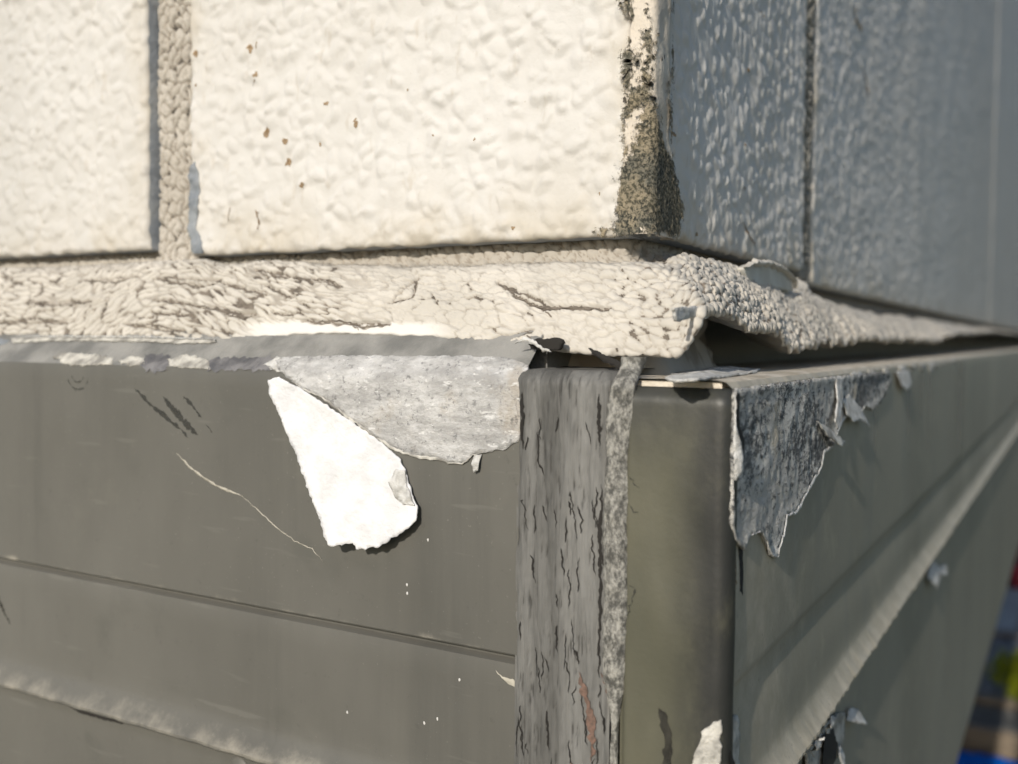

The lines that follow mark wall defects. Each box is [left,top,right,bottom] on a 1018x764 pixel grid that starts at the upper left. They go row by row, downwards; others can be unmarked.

crack [0,0,870,354]
leakage [592,0,685,238]
peeling [264,354,529,550]
peeling [729,358,964,558]
peeling [927,560,948,589]
peeling [692,715,741,764]
peeling [804,708,867,764]